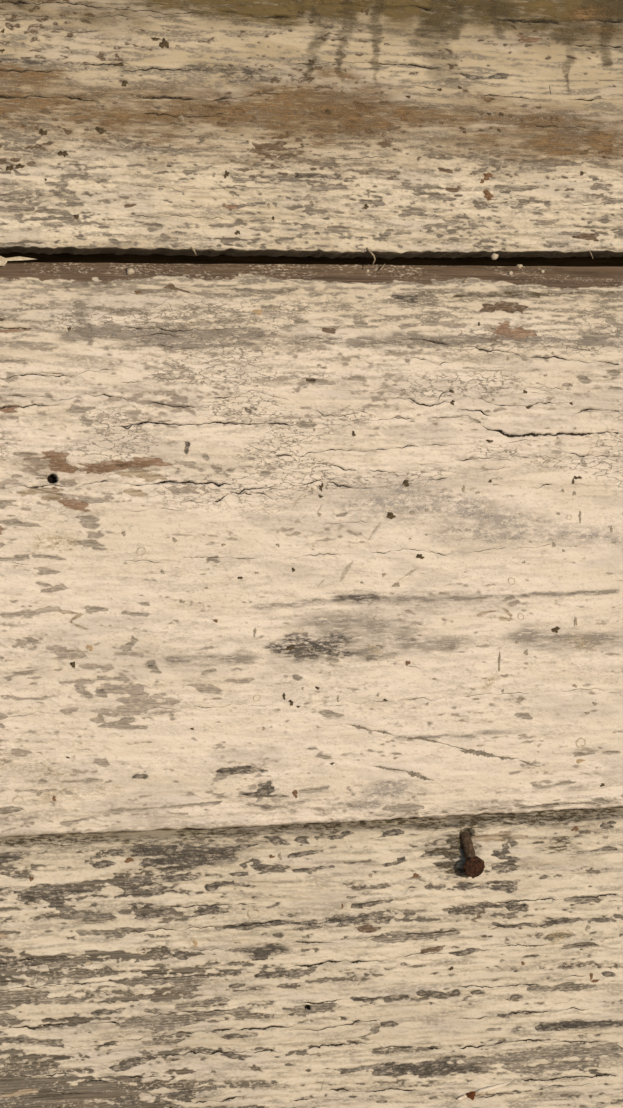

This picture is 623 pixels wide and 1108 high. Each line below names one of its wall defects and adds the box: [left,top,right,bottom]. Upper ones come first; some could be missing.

water stain [307,53,356,80]
water stain [0,65,506,146]
water stain [514,115,623,158]
crack [120,303,271,351]
crack [360,338,619,365]
crack [0,369,619,512]
peeling [0,442,235,593]
peeling [92,836,406,898]
peeling [422,828,618,928]
peeling [0,884,170,938]
peeling [190,884,486,956]
peeling [337,1043,623,1078]